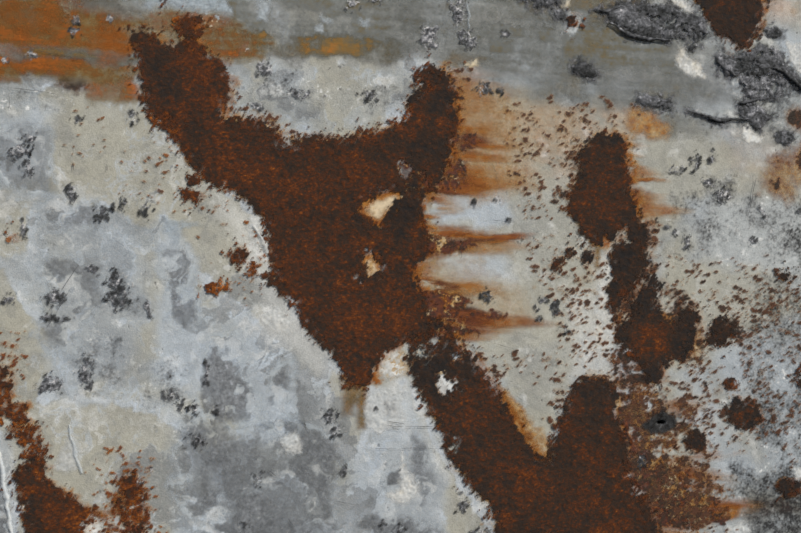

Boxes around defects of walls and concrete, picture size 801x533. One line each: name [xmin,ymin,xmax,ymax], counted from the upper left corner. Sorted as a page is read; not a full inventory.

rust [693,0,775,58]
rust [504,102,540,134]
rust [623,103,669,138]
rust [504,137,544,162]
rust [507,170,553,220]
rust [200,275,246,297]
rust [561,267,593,324]
rust [683,263,718,283]
rust [720,377,740,391]
rust [749,362,788,405]
rust [0,331,168,533]
rust [756,400,801,440]